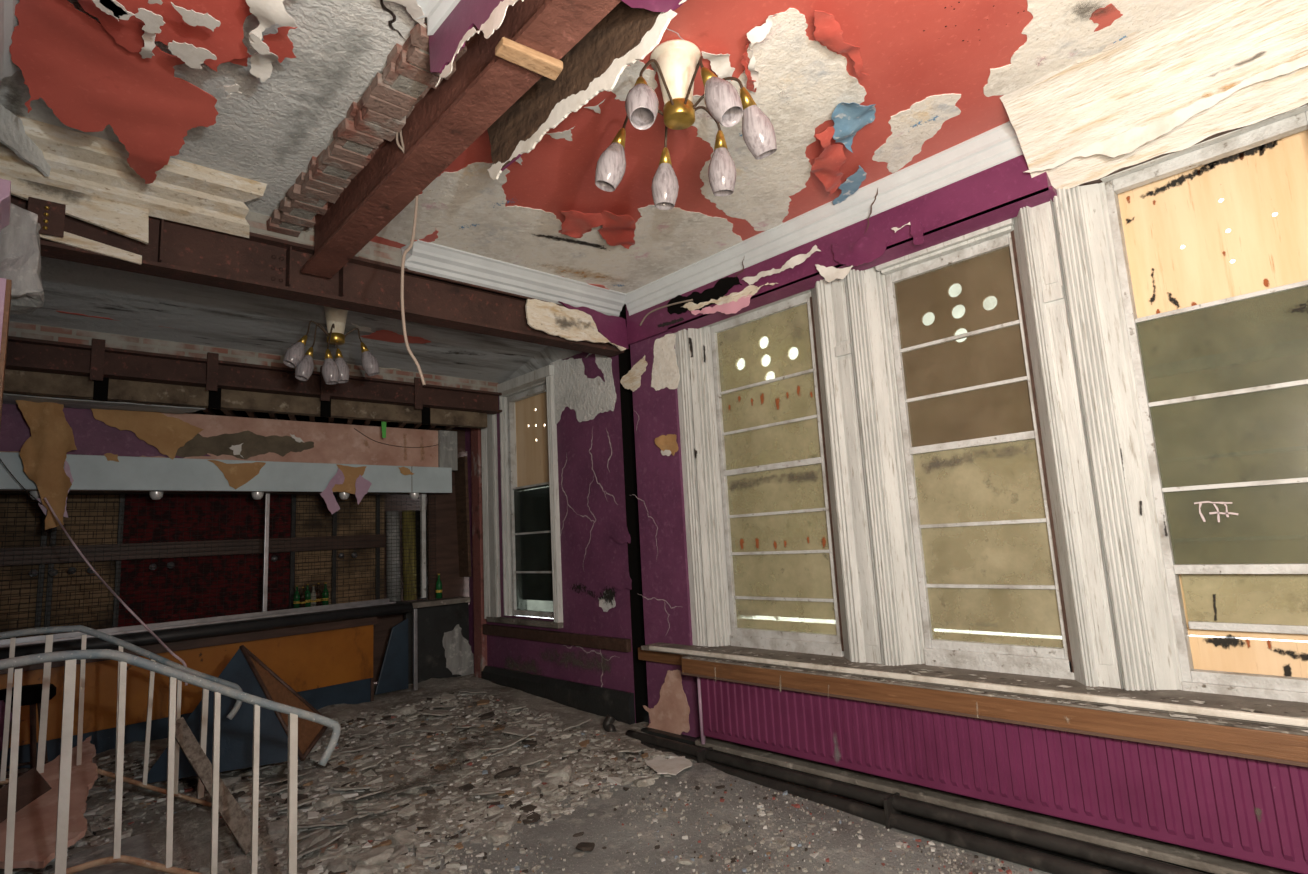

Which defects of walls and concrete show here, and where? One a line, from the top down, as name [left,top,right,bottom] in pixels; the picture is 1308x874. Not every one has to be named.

peeling [385,0,427,29]
peeling [0,0,298,184]
spalling [983,0,1308,190]
peeling [376,8,961,294]
spalling [640,219,925,326]
flaking render [550,333,680,425]
peeling [16,396,77,530]
peeling [208,460,266,489]
peeling [320,464,372,514]
crack [560,411,658,572]
flaking render [643,669,690,735]